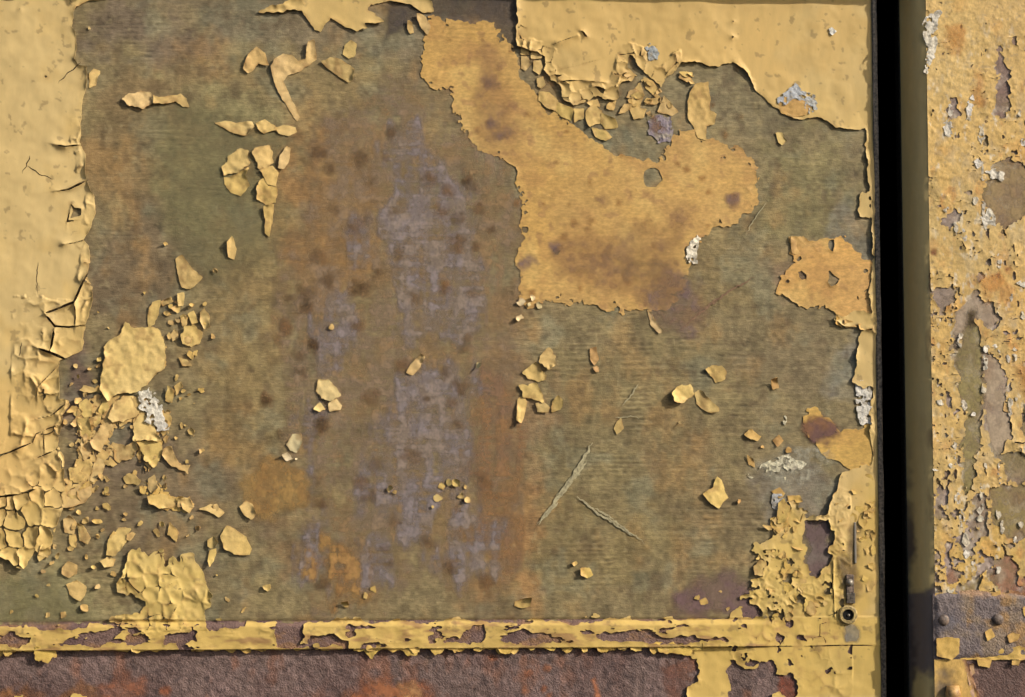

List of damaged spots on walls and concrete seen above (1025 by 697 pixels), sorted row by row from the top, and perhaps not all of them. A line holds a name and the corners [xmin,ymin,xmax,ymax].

peeling [995,38,1016,118]
peeling [985,159,1025,232]
crack [19,266,88,382]
peeling [0,0,876,625]
crack [1,404,65,458]
corrosion [803,417,838,444]
peeling [931,274,1025,556]
crack [0,489,34,513]
peeling [34,646,57,663]
peeling [354,642,703,659]
corrosion [779,675,797,697]